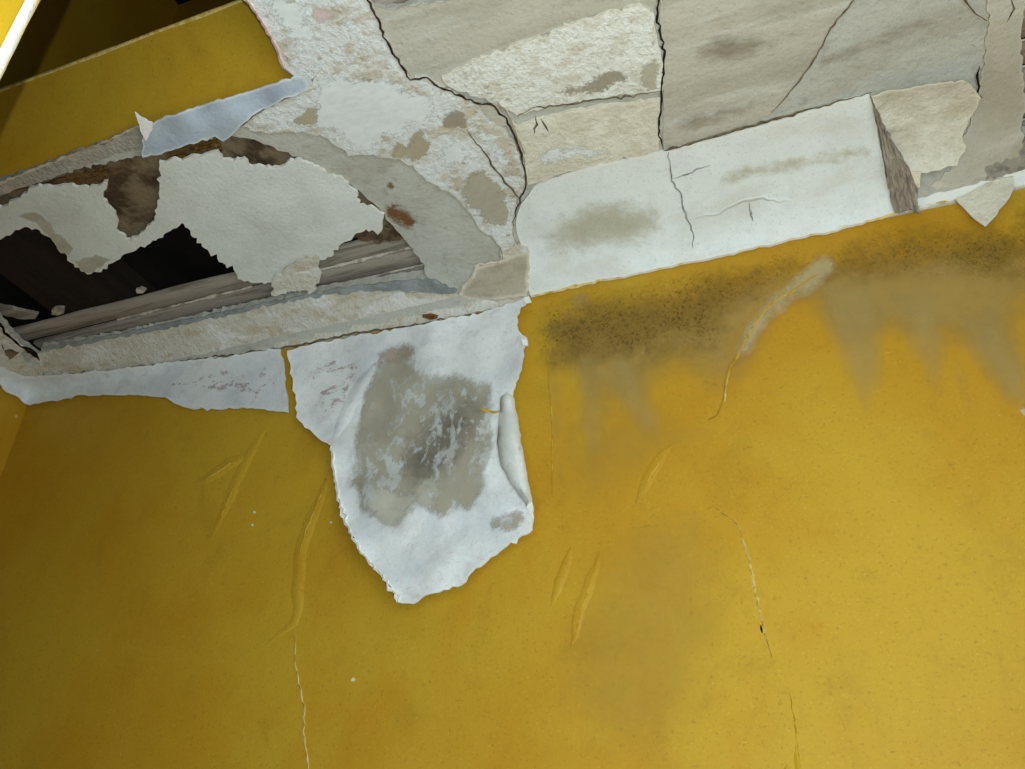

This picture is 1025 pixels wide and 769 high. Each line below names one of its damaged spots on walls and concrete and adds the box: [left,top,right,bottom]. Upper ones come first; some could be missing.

flaking render [0,0,853,296]
crack [366,0,872,246]
flaking render [873,0,1025,227]
peeling [0,296,534,604]
leakage [352,346,492,524]
leakage [565,292,772,387]
leakage [816,254,1025,347]